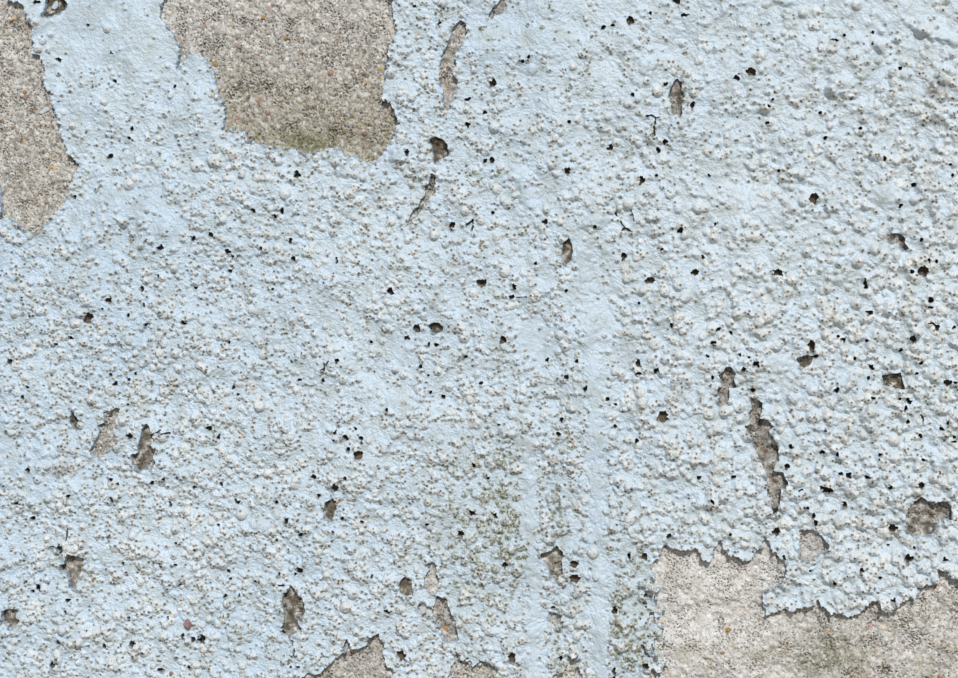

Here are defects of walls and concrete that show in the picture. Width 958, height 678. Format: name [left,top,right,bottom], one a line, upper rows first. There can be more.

peeling [0,0,79,234]
peeling [159,0,400,163]
peeling [439,20,467,111]
peeling [89,407,156,471]
peeling [745,397,790,515]
peeling [280,586,305,638]
peeling [301,633,406,678]
peeling [398,562,497,678]
peeling [540,545,581,585]
peeling [627,528,958,678]
peeling [799,512,830,562]
peeling [888,482,953,536]